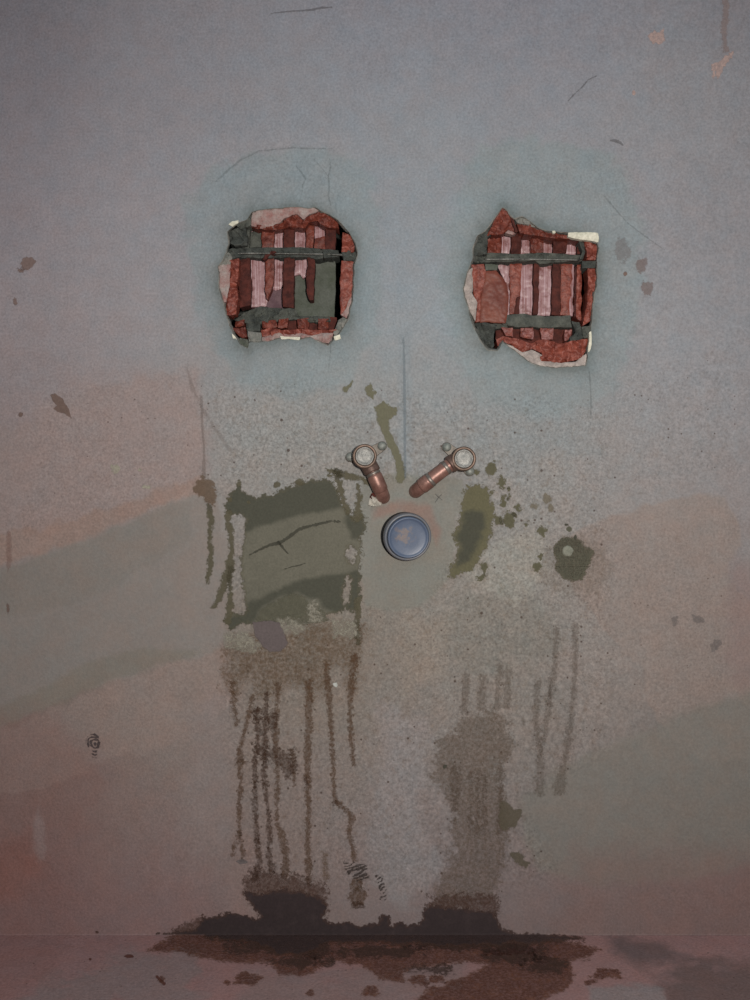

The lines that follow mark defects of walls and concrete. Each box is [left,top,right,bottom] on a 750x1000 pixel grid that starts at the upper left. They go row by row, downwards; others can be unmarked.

spalling [218,207,358,348]
spalling [463,208,599,368]
water stain [365,384,406,483]
water stain [205,468,370,654]
crack [250,520,341,569]
water stain [447,460,554,581]
water stain [532,524,595,582]
water stain [156,867,584,957]